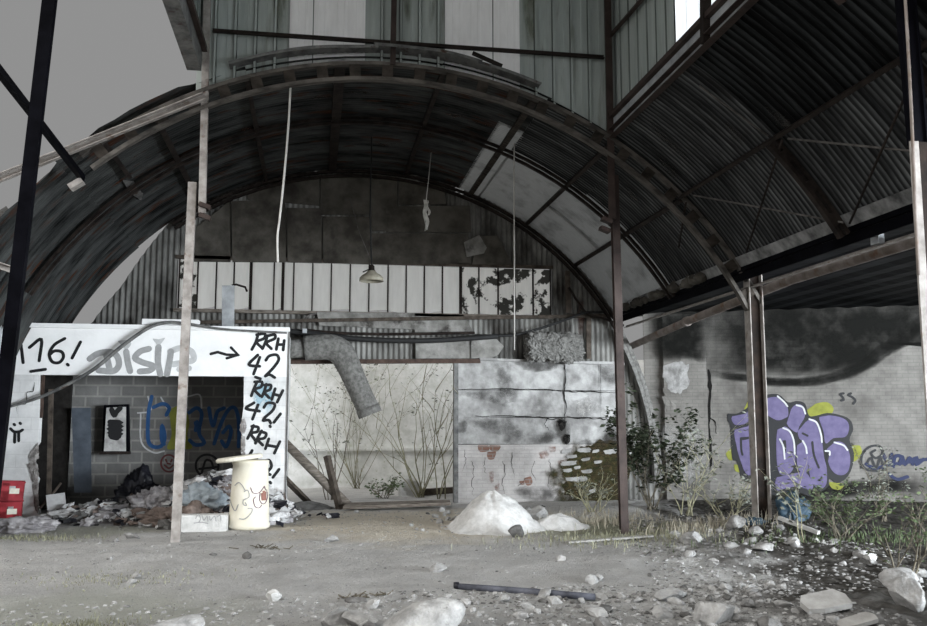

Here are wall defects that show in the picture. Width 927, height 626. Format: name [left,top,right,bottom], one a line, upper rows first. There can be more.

damp [655,310,747,381]
damp [764,305,921,386]
crack [478,364,615,439]
peeling [478,445,501,460]